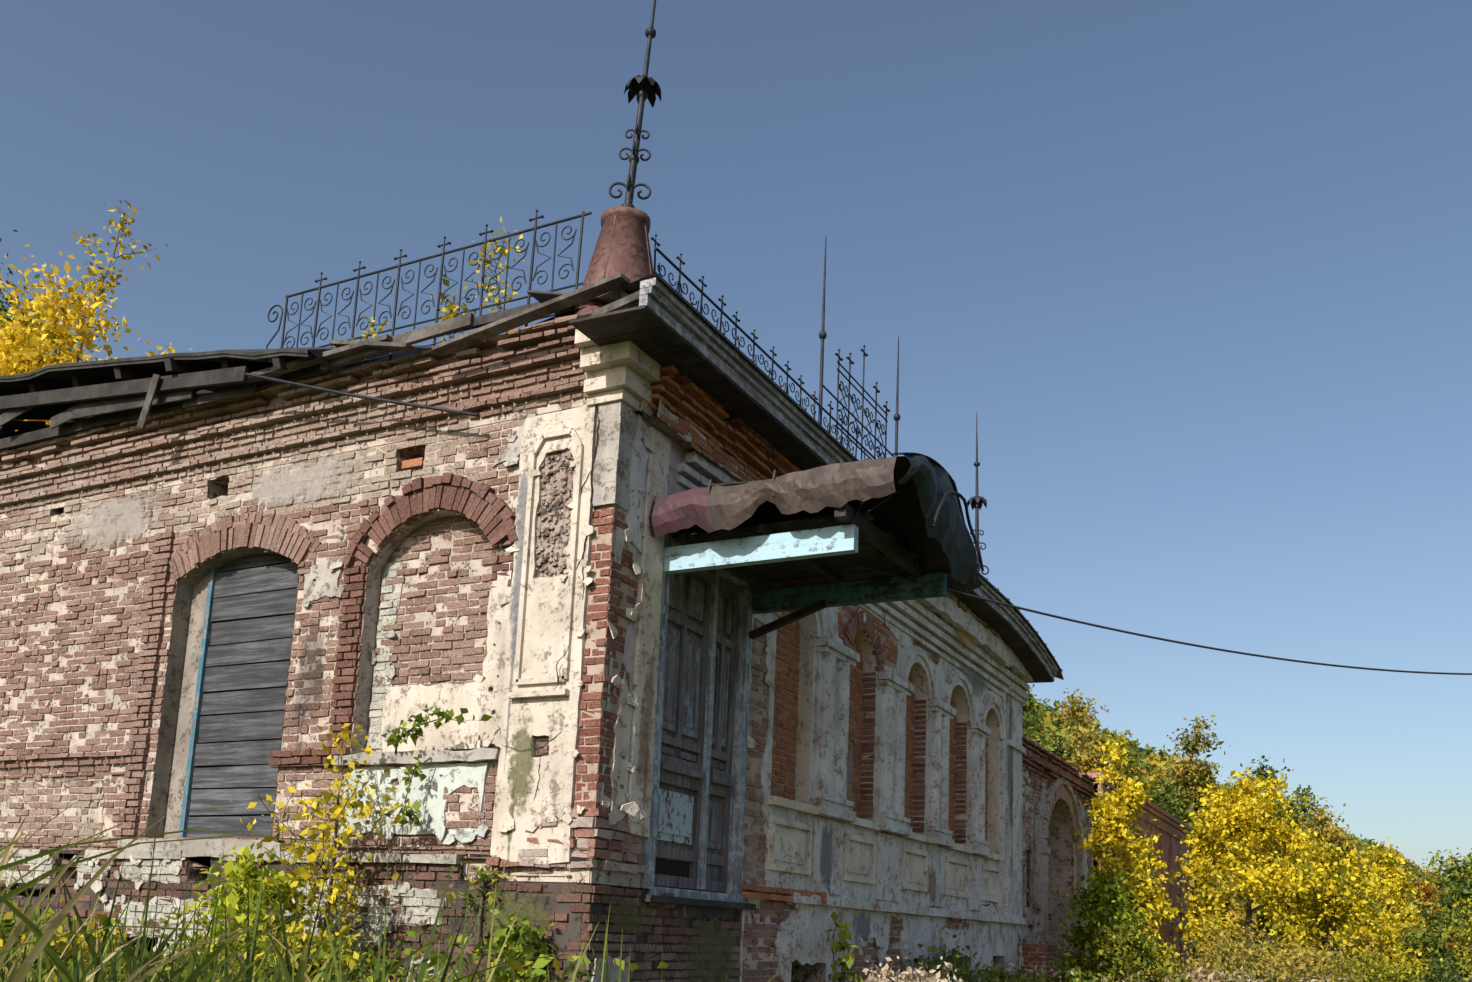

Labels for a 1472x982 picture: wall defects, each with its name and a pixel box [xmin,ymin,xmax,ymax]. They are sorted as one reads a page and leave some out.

spalling [340,400,762,874]
flaking render [837,605,941,668]
flaking render [682,618,829,982]
spalling [0,775,231,982]
peeling [284,877,447,956]
flaking render [847,895,906,982]
flaking render [942,918,971,935]